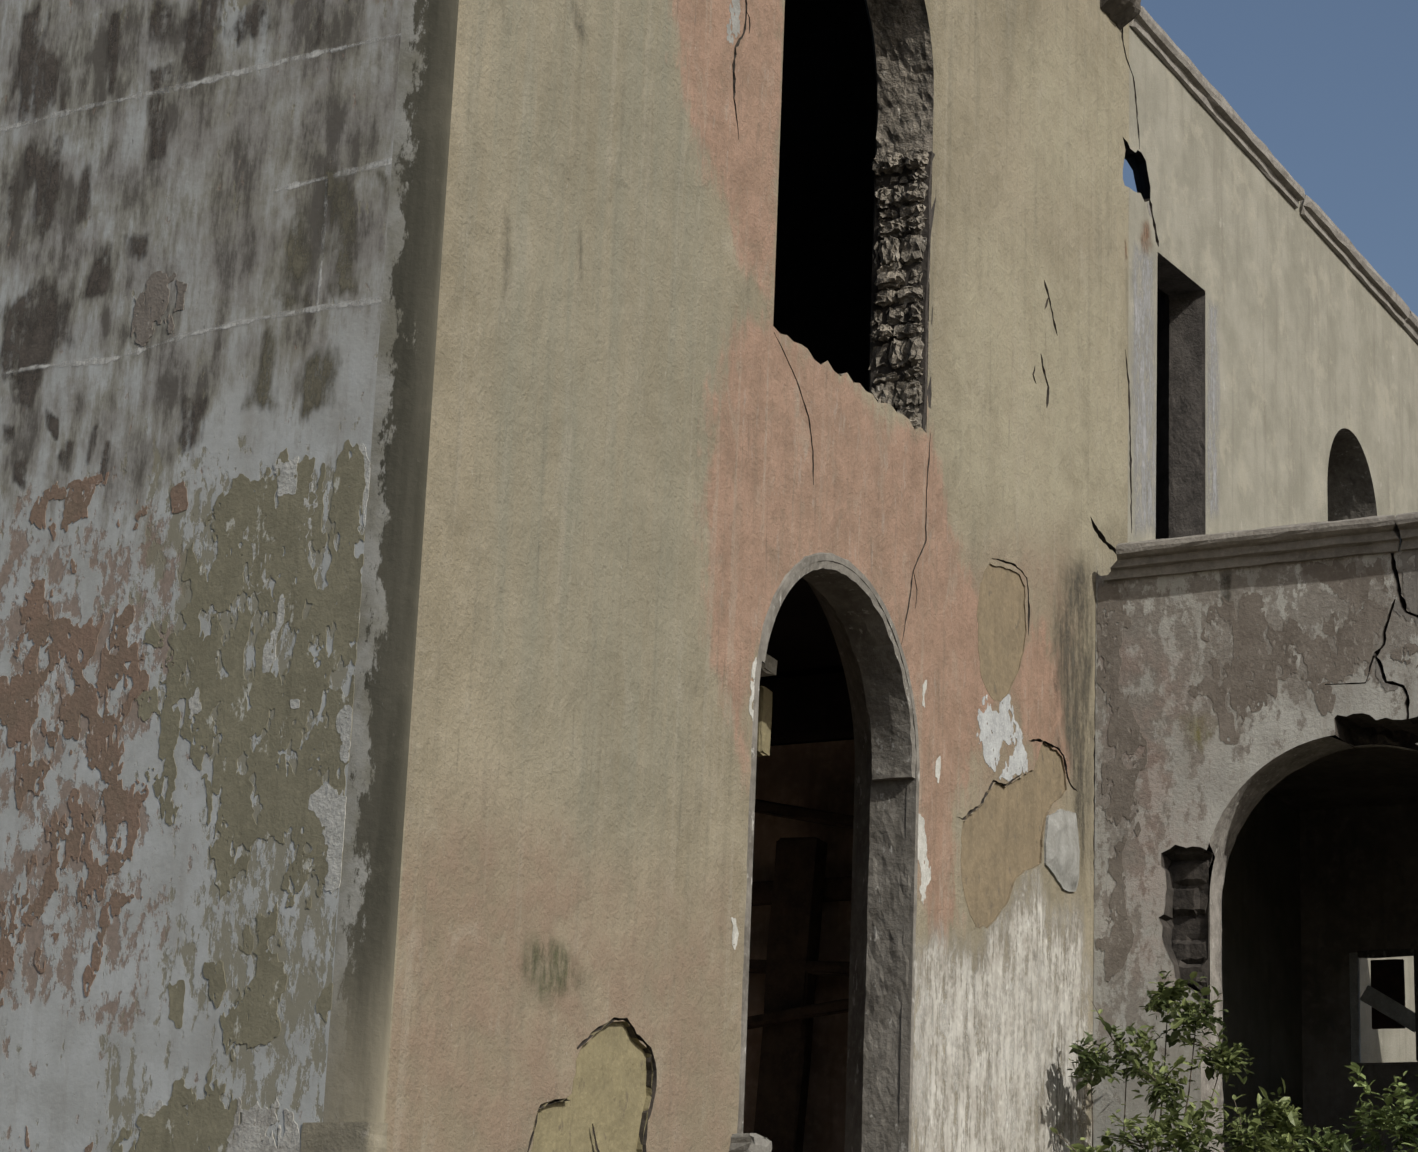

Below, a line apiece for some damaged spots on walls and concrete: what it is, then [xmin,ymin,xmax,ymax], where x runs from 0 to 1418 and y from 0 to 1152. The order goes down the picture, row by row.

leakage [13,4,65,118]
leakage [149,0,266,158]
crack [732,0,750,139]
leakage [1,279,72,407]
leakage [47,414,73,466]
crack [774,333,814,485]
flaking render [868,148,936,430]
crack [901,433,931,645]
crack [1325,553,1418,725]
peeling [0,439,370,1061]
flaking render [1159,845,1213,1003]
flaking render [531,1021,653,1152]